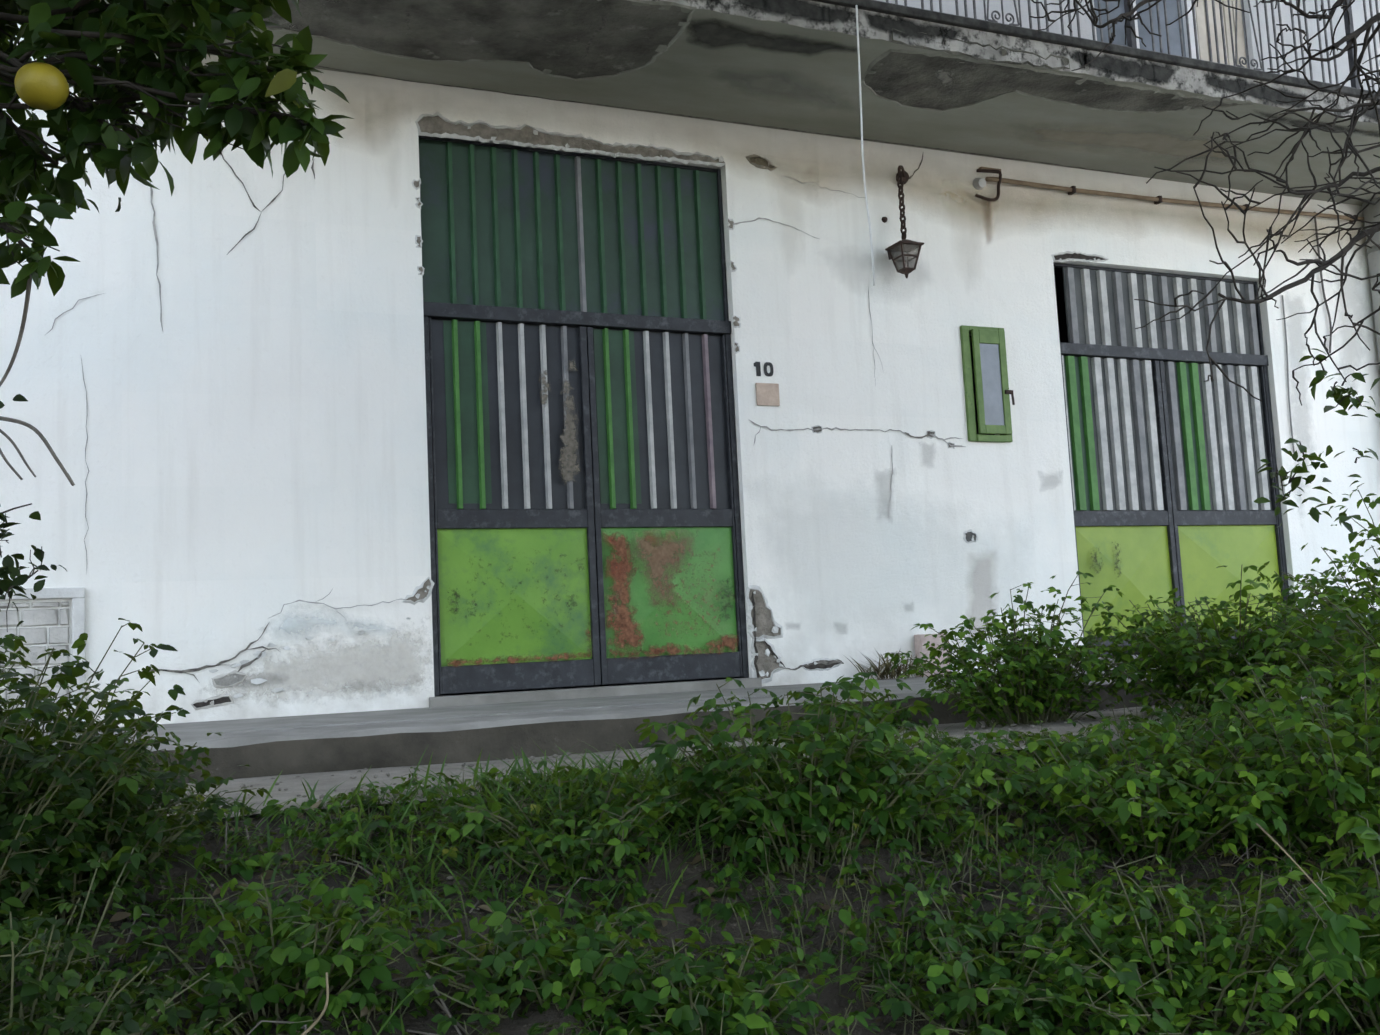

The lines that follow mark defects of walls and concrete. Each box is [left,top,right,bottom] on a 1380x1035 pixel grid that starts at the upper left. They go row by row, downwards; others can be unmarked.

peeling [263,0,697,81]
peeling [861,28,1255,113]
spalling [415,112,726,167]
crack [749,420,965,518]
crack [137,590,406,682]
corrosion [606,532,738,659]
spalling [746,585,841,684]